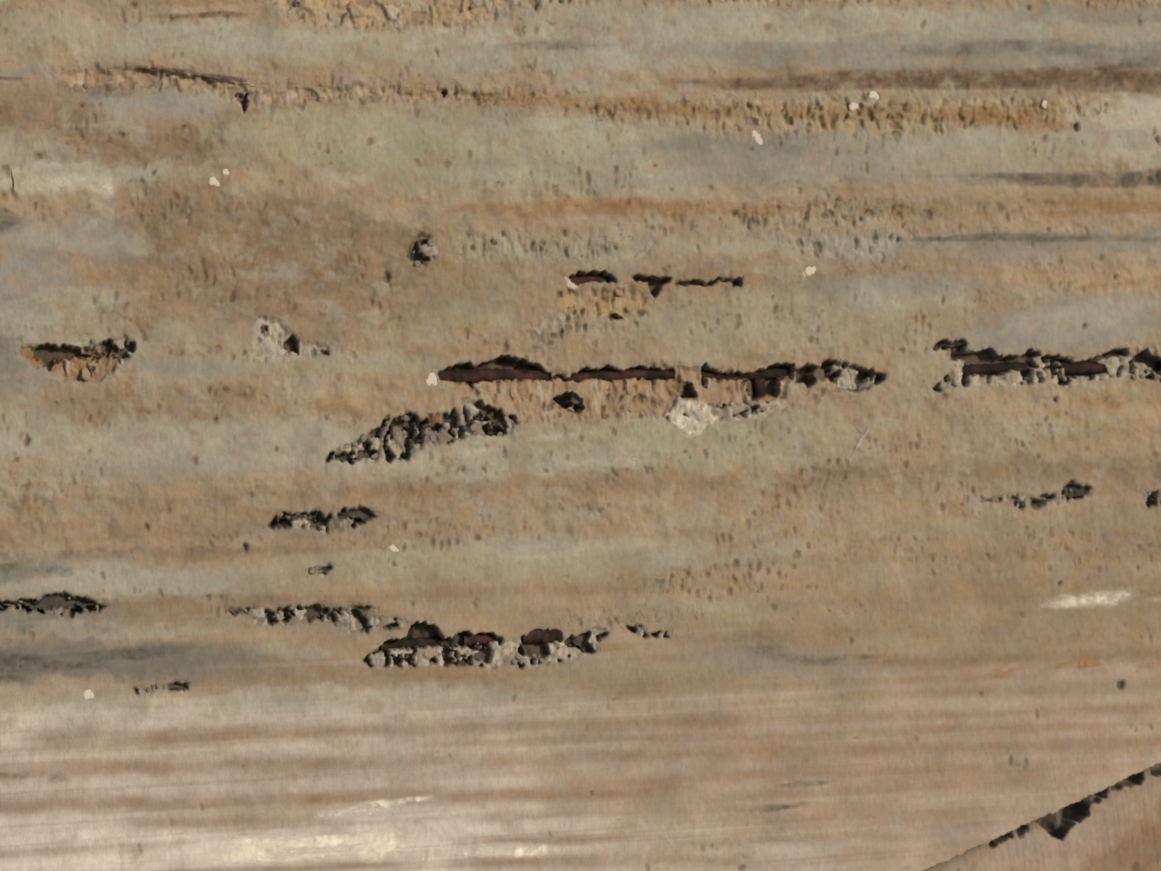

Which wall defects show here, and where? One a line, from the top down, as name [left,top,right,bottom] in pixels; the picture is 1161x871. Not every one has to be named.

spalling [16,334,136,386]
spalling [249,314,330,364]
spalling [426,226,890,438]
spalling [929,338,1161,404]
spalling [360,618,610,671]
spalling [624,622,672,640]